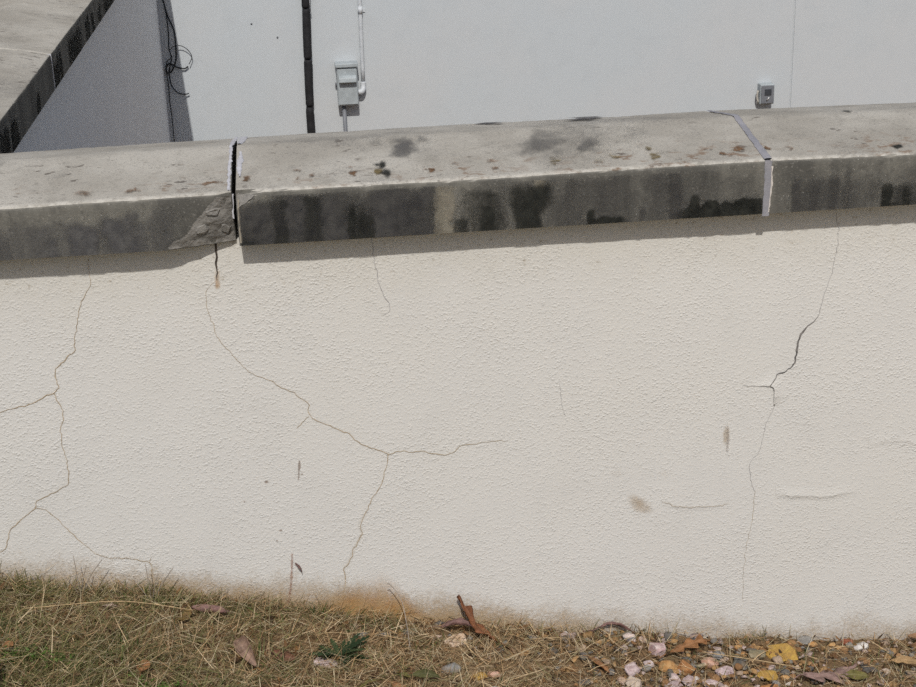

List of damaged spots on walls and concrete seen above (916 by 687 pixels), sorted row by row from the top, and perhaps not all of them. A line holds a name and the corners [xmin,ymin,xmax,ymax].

water stain [54,0,113,88]
water stain [1,120,20,154]
water stain [393,140,413,156]
water stain [238,186,502,246]
water stain [512,180,550,229]
water stain [587,178,624,224]
water stain [640,172,763,221]
water stain [881,184,916,206]
crack [0,260,154,585]
crack [206,239,506,595]
crack [742,213,839,599]